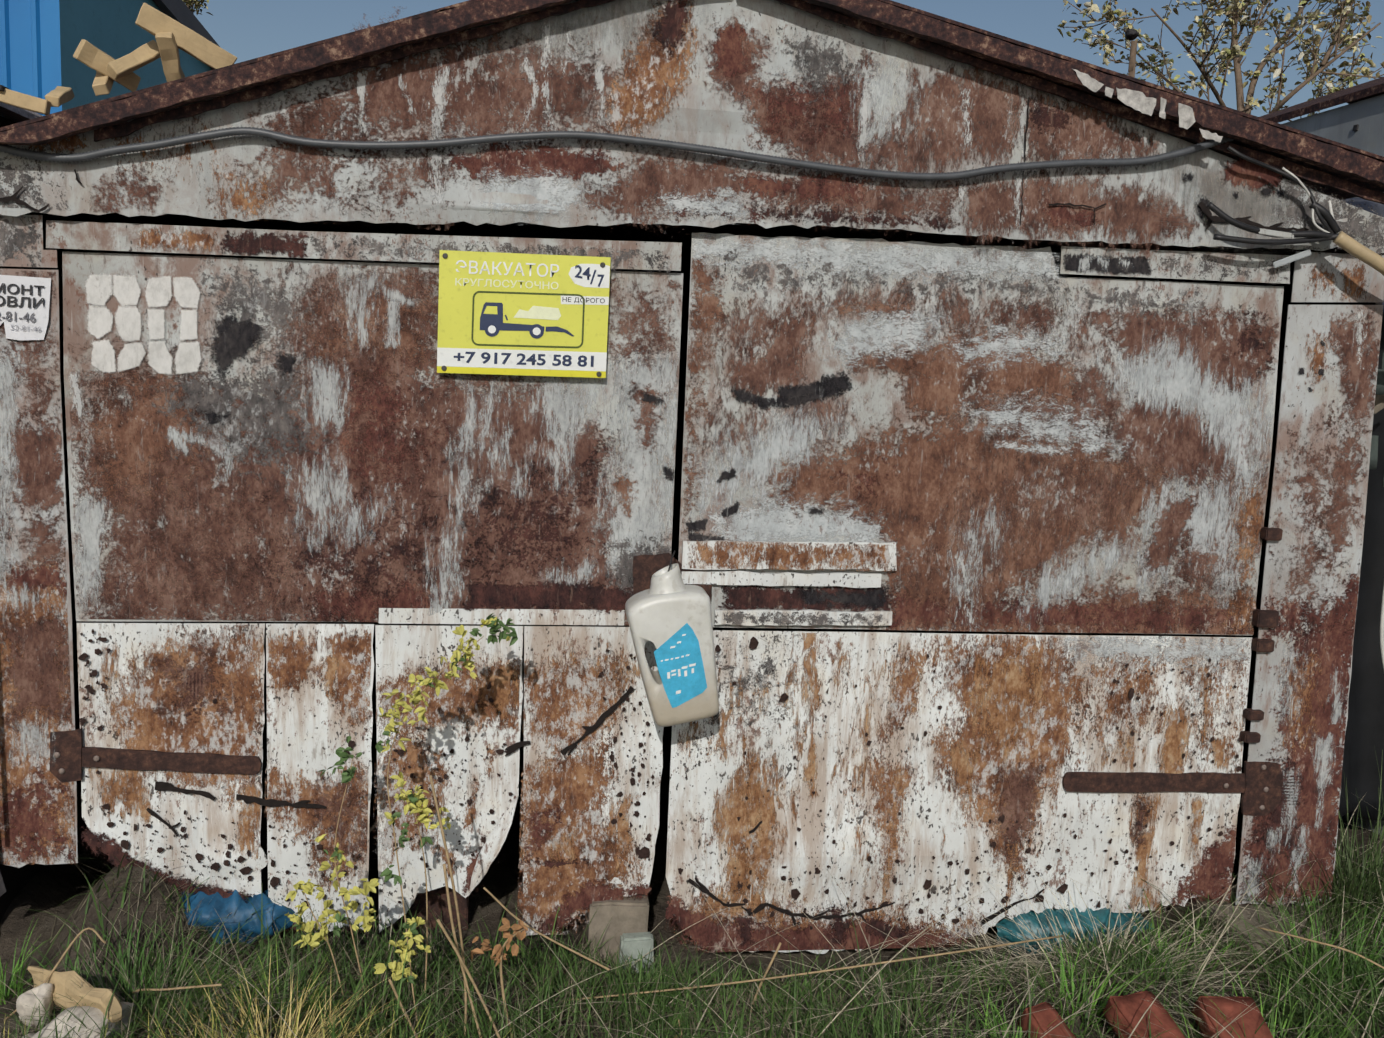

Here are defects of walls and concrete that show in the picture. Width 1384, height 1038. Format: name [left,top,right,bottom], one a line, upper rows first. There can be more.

peeling [1073,69,1223,143]
rust [1220,158,1284,195]
rust [0,0,1206,935]
rust [606,256,1380,953]
spalling [392,736,477,806]
spalling [102,803,252,881]
spalling [268,825,357,909]
spalling [389,809,495,876]